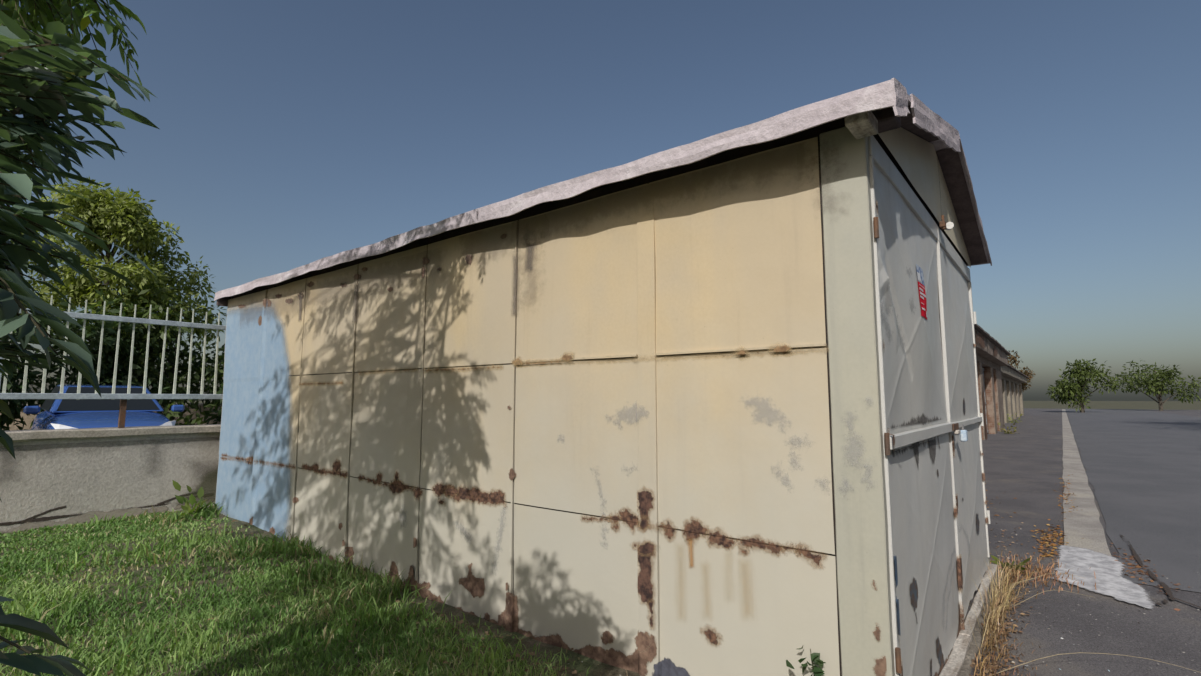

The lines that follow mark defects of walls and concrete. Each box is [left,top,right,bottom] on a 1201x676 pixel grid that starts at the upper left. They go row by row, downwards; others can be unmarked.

corrosion [221,454,504,505]
corrosion [582,488,821,627]
peeling [327,523,690,676]
corrosion [704,628,720,645]
peeling [873,656,887,676]
peeling [894,556,918,635]
peeling [931,638,945,676]
corrosion [957,604,965,638]